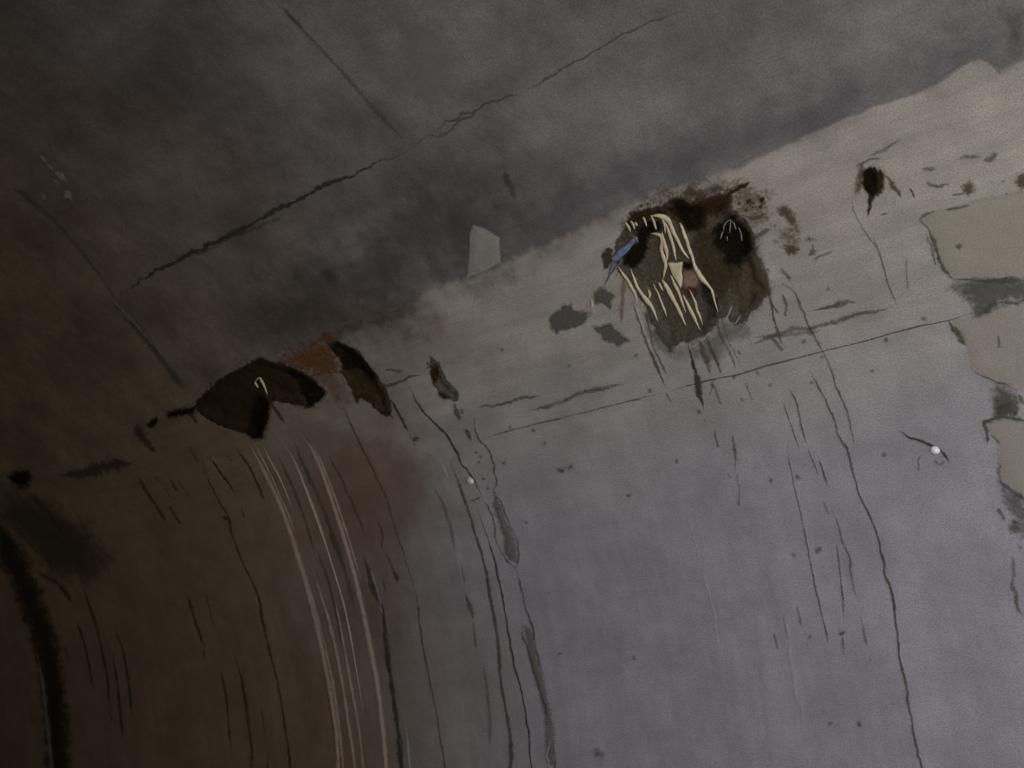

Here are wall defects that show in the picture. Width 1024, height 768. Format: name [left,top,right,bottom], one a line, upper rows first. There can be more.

crack [536,8,684,86]
crack [131,94,512,289]
spalling [855,164,915,215]
spalling [601,192,770,352]
peeling [924,193,1024,284]
spalling [195,358,325,439]
spalling [328,341,392,417]
spalling [427,357,463,419]
crack [617,318,956,409]
crack [899,430,949,461]
leakage [237,441,411,768]
crack [409,387,532,768]